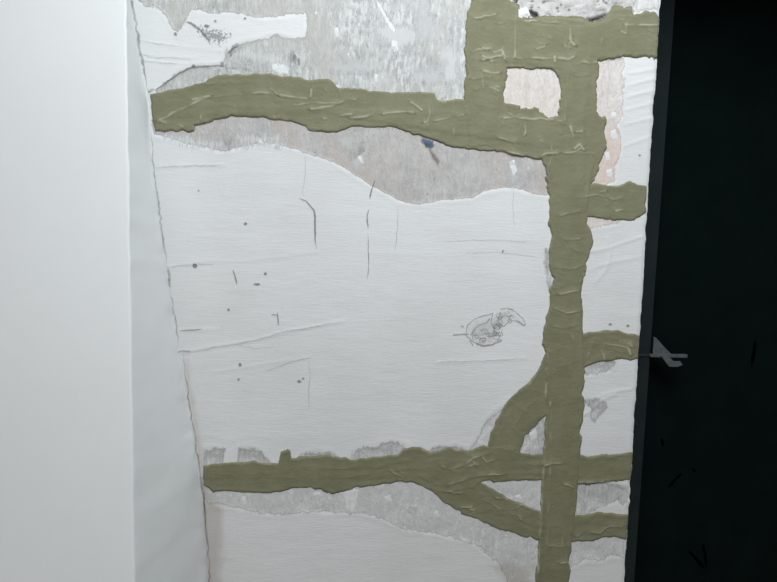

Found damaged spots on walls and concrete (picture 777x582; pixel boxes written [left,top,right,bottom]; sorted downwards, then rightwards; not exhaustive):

spalling [510,0,659,21]
flaking render [139,0,471,101]
flaking render [503,68,561,118]
flaking render [592,58,625,185]
flaking render [152,116,549,204]
flaking render [205,448,225,466]
flaking render [237,448,269,463]
flaking render [353,442,404,460]
flaking render [575,482,628,515]
flaking render [200,478,541,582]